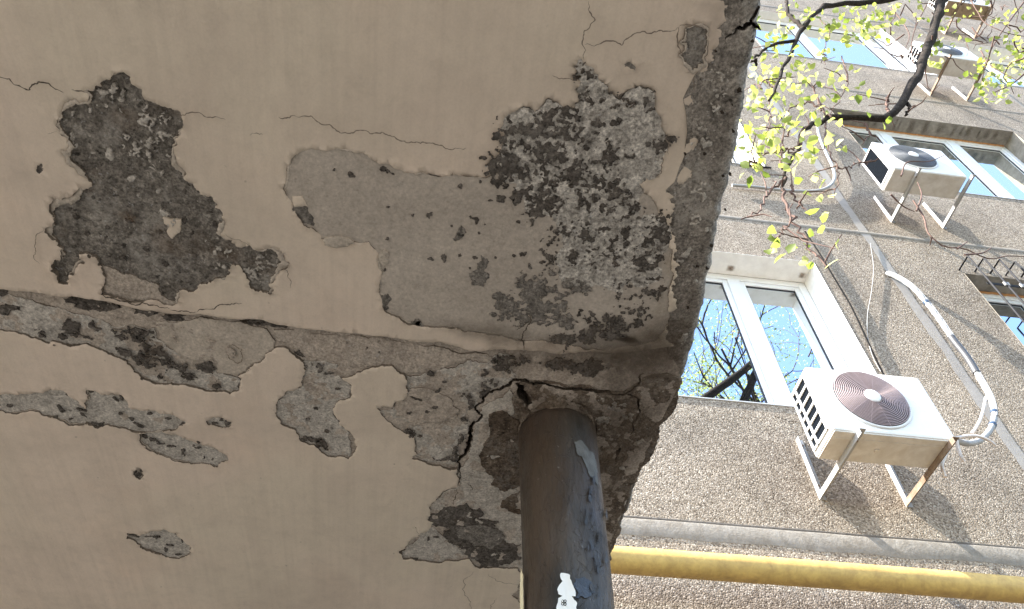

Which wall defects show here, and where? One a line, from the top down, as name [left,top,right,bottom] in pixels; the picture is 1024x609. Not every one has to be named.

crack [554,1,678,81]
crack [725,6,761,38]
crack [102,294,242,313]
spalling [0,23,742,602]
crack [517,315,532,346]
crack [452,373,644,505]